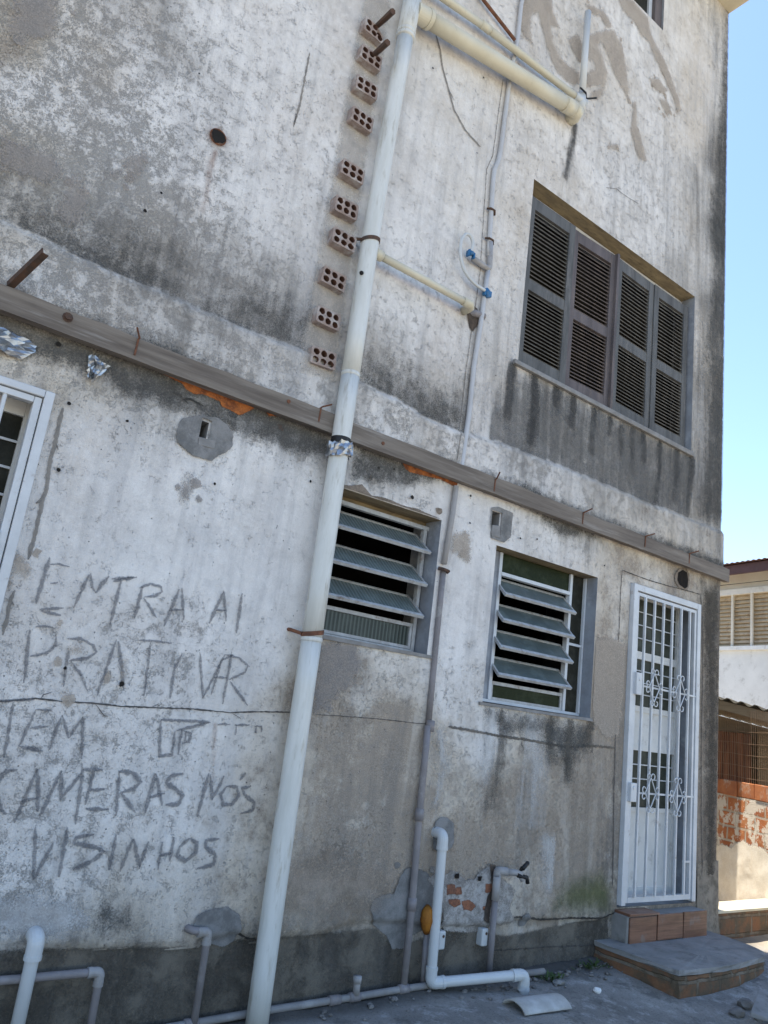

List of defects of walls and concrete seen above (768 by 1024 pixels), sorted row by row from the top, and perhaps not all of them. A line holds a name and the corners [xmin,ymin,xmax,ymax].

leakage [1,197,180,296]
leakage [490,11,729,525]
leakage [206,293,307,347]
leakage [0,314,327,455]
spalling [164,374,254,417]
crack [0,692,290,719]
leakage [485,707,594,806]
spalling [428,864,514,934]
leakage [0,950,25,1024]
leakage [25,940,257,1024]
leakage [271,929,423,1005]
leakage [437,917,608,976]